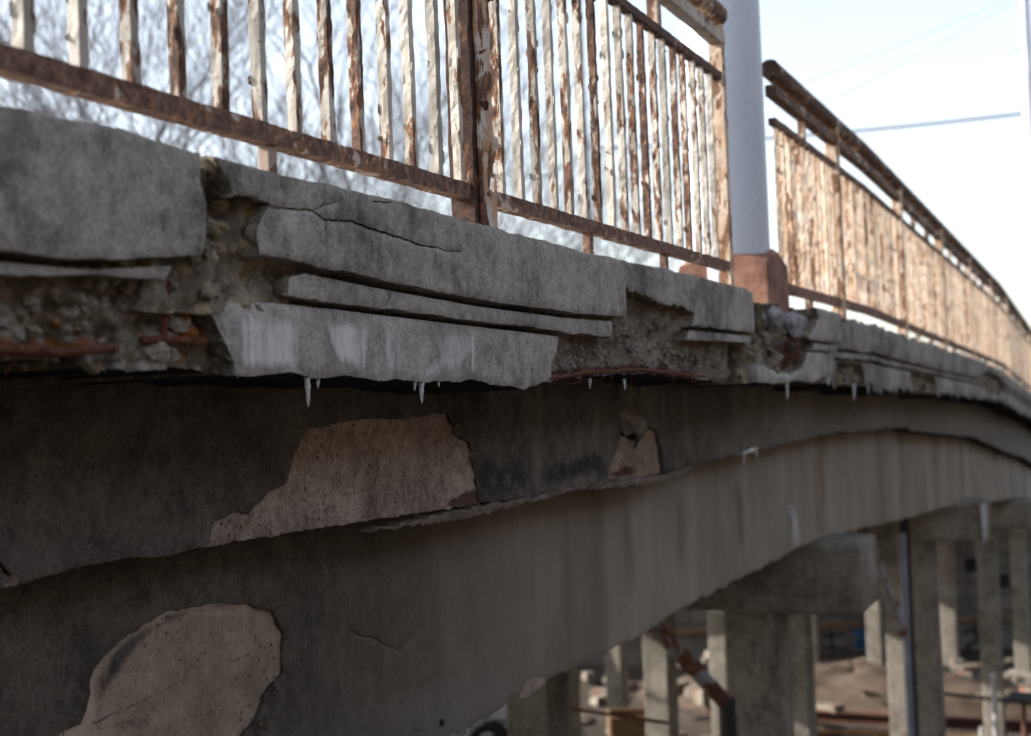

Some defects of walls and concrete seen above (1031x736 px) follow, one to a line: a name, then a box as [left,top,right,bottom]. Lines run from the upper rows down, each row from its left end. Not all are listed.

spalling [0,168,321,380]
crack [264,201,459,252]
spalling [522,296,866,388]
peeling [195,413,696,549]
peeling [57,602,284,736]